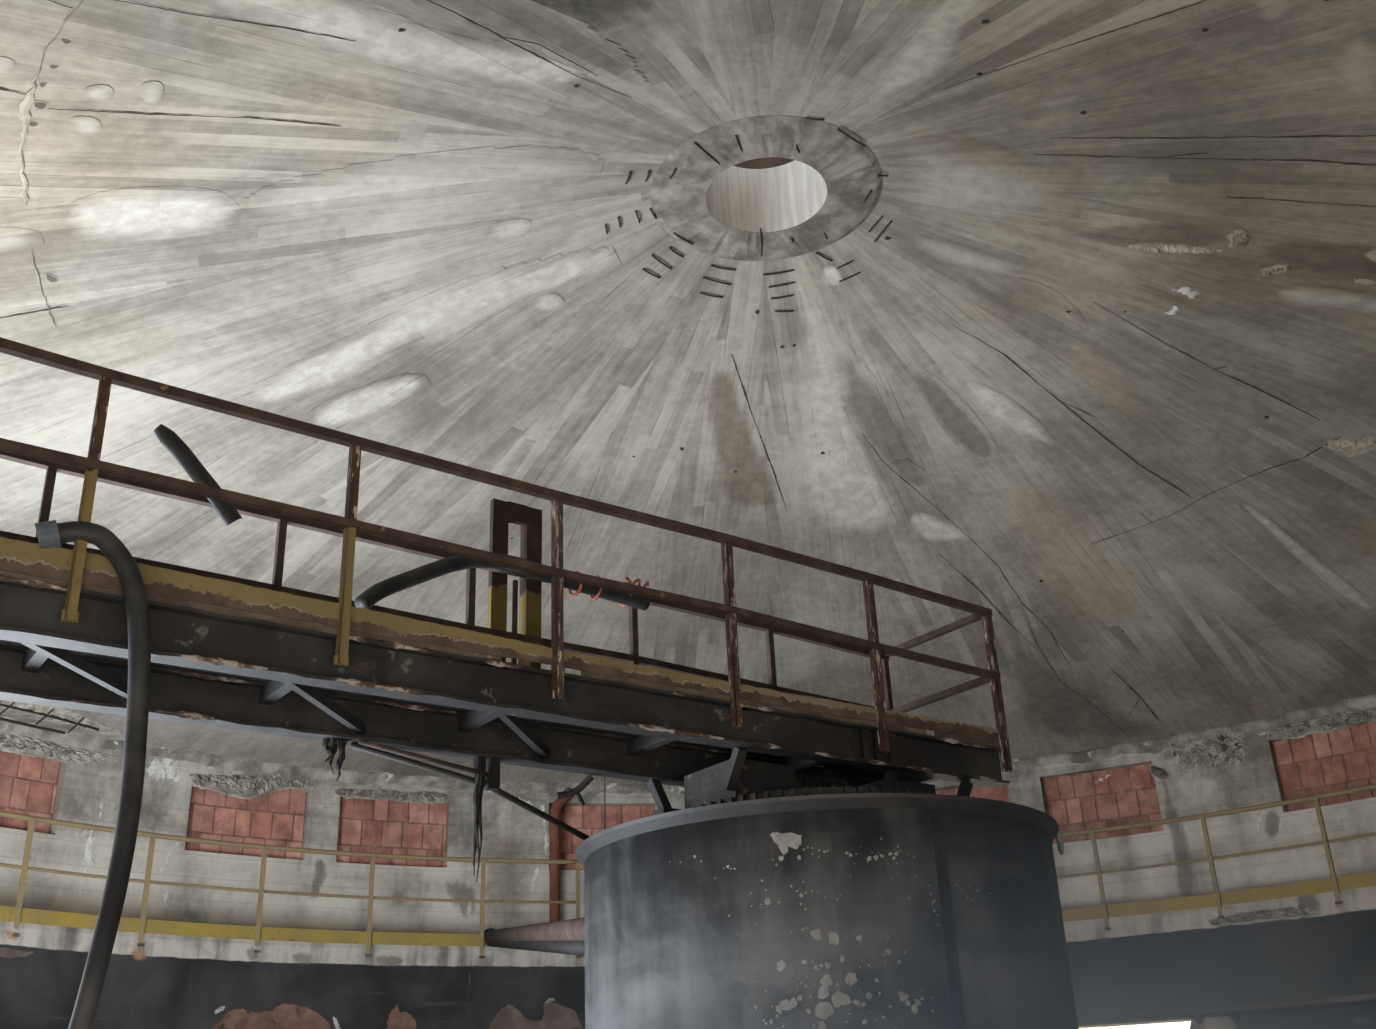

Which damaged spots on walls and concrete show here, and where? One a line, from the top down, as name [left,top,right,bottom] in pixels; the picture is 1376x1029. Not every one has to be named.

water stain [187,0,676,92]
crack [1034,135,1376,166]
crack [1228,197,1376,207]
spalling [1127,228,1250,254]
spalling [1352,249,1376,287]
crack [953,302,1341,545]
spalling [0,699,125,765]
peeling [156,710,216,720]